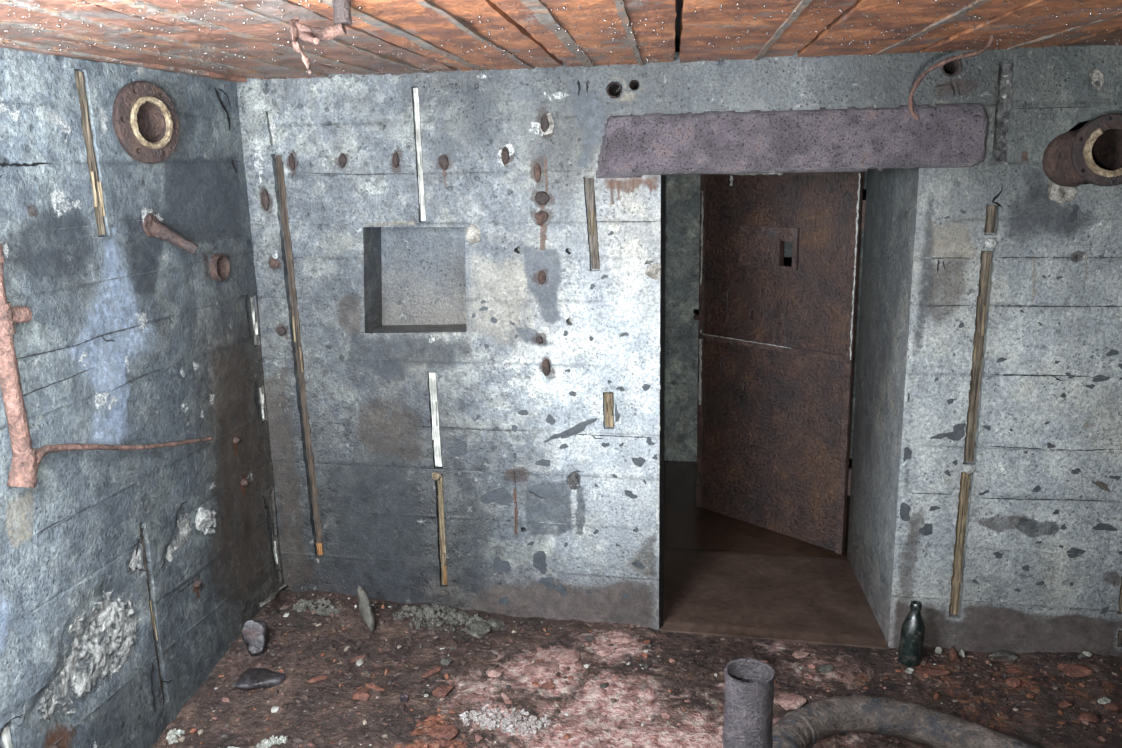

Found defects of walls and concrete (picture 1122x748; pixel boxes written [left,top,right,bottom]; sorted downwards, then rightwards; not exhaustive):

crack [0,162,52,177]
efflorescence [51,187,84,217]
corrosion [531,159,554,250]
corrosion [606,177,658,204]
damp [894,602,1122,657]